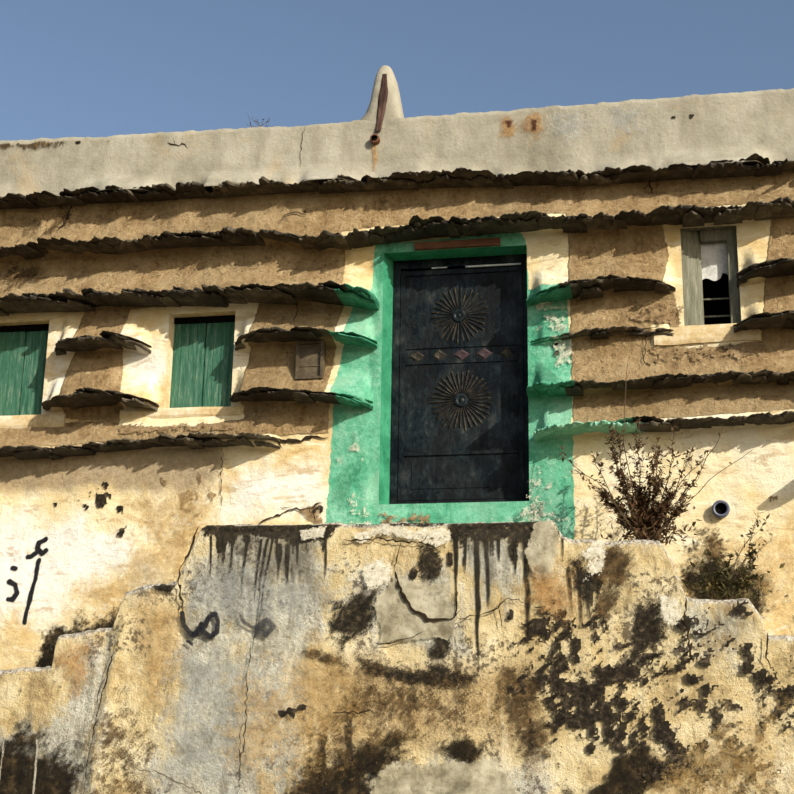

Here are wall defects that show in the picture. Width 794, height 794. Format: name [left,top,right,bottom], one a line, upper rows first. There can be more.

rust [502,113,547,137]
peeling [537,299,574,368]
flaking render [78,481,111,511]
crack [177,526,199,621]
leakage [201,524,340,643]
crack [259,502,320,524]
crack [343,536,523,645]
flaking render [510,466,570,583]
leakage [550,521,635,624]
leakage [284,521,553,794]
leakage [0,685,161,794]
crack [83,640,116,794]